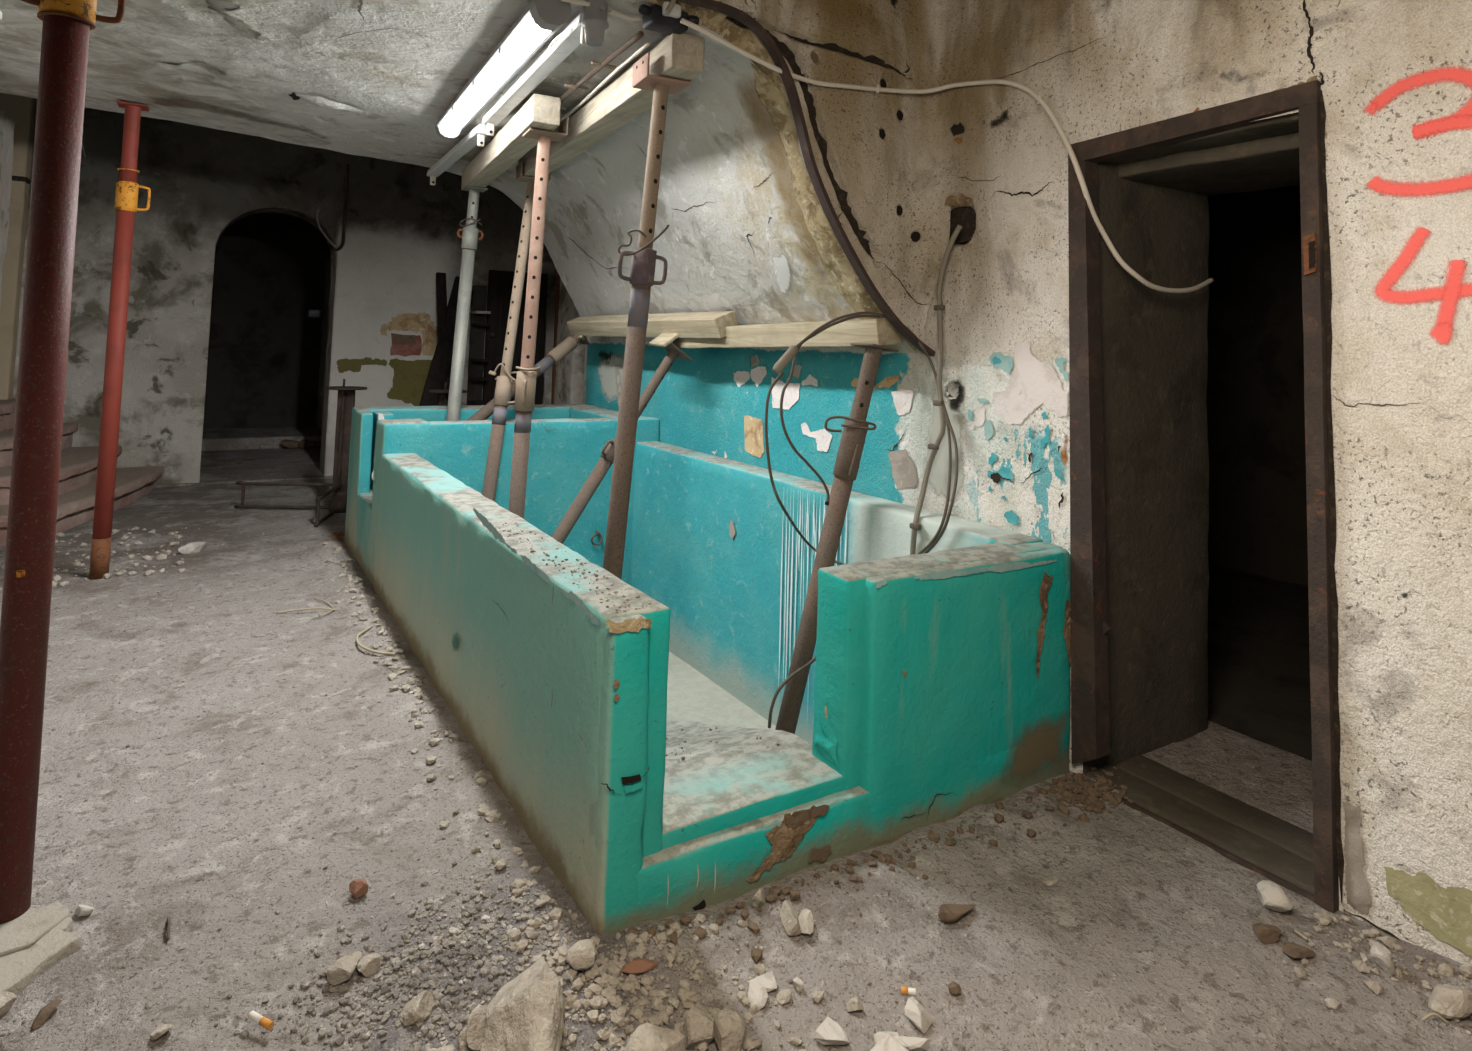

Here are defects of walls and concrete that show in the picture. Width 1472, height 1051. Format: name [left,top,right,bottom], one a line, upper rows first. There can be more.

crack [729,0,931,305]
peeling [337,311,438,420]
flaking render [968,342,1069,525]
crack [1303,0,1420,940]
spalling [746,805,832,882]
peeling [1342,802,1472,957]